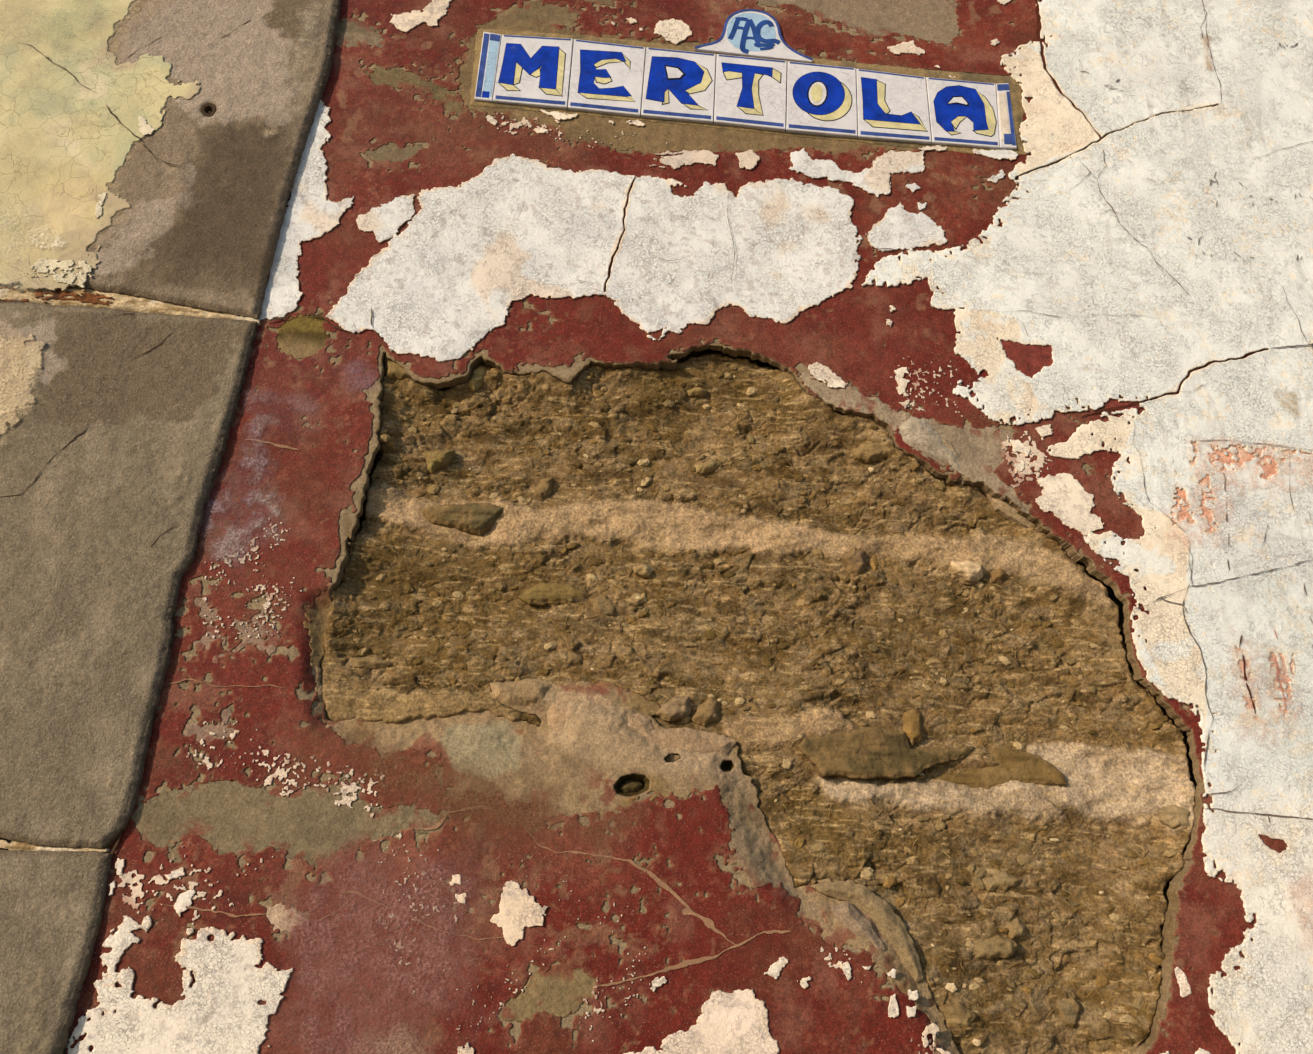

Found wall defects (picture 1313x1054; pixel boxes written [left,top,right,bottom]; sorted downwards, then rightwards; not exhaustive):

peeling [0,0,201,291]
crack [580,177,636,293]
crack [1015,0,1222,289]
flaking render [260,0,1196,1054]
crack [1081,288,1313,823]
crack [415,805,791,986]